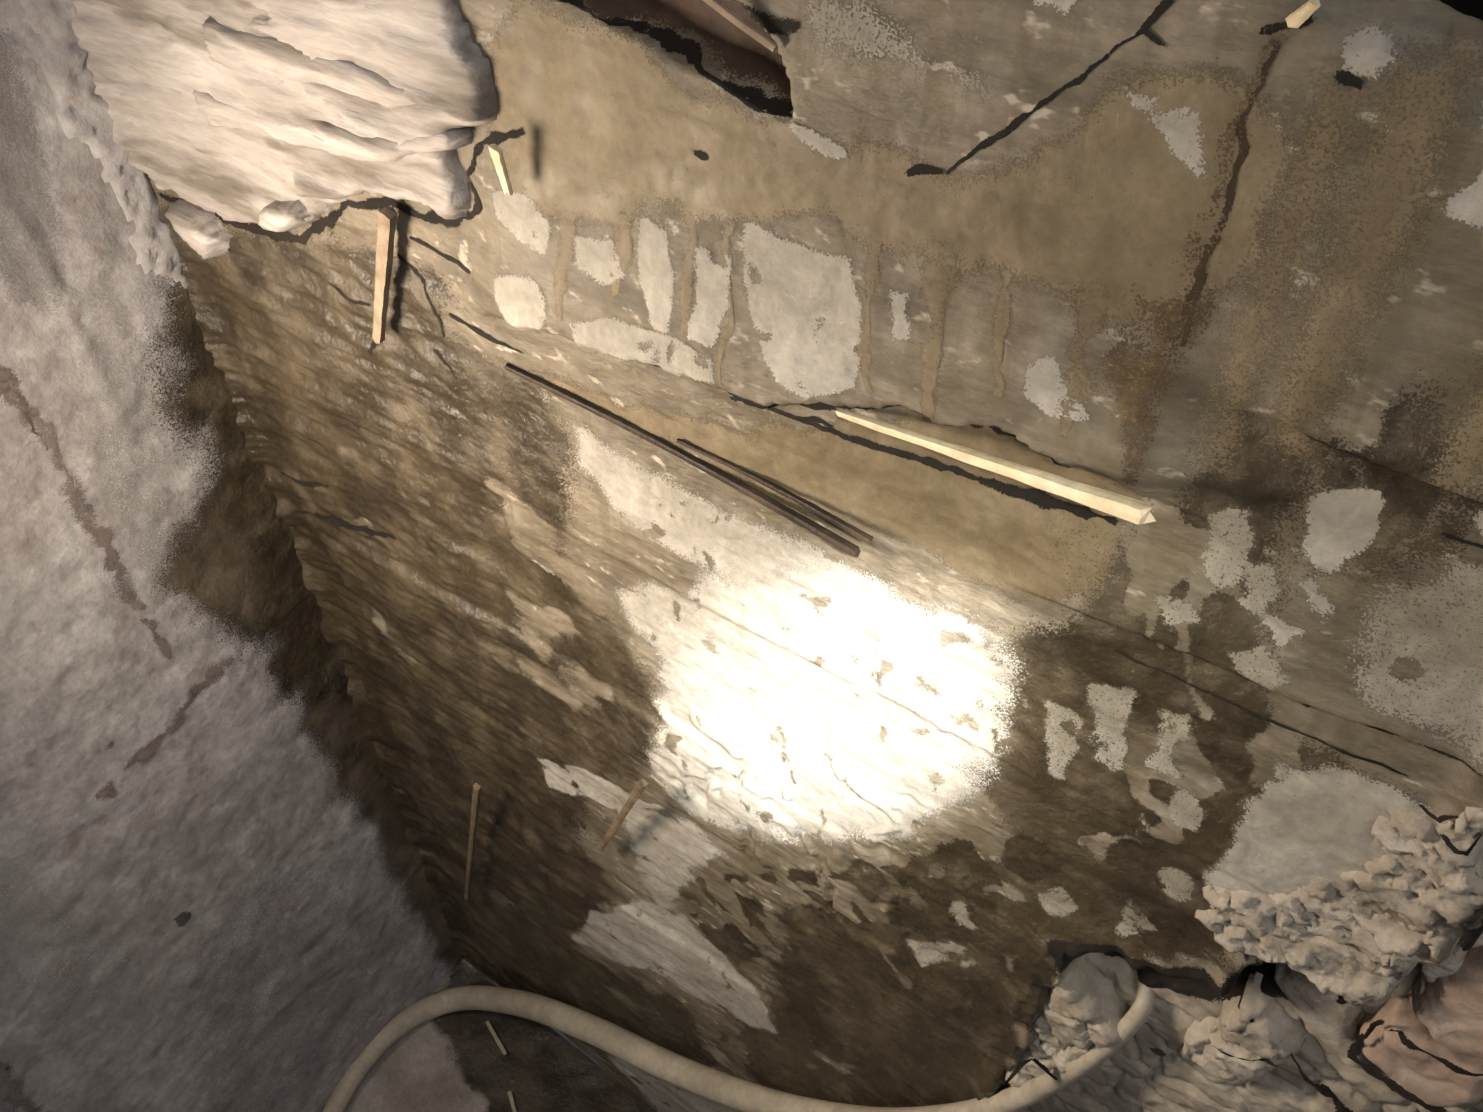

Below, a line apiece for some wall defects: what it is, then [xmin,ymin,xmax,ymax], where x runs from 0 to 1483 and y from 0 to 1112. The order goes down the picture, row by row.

spalling [559,0,996,160]
crack [904,0,1174,177]
rust [1095,26,1290,486]
crack [0,365,173,659]
damp [124,191,720,1067]
crack [728,393,1118,526]
damp [713,34,1483,1107]
crack [1073,609,1483,856]
peeling [1155,756,1483,904]
peeling [1199,485,1483,774]
damp [430,1010,658,1112]
spalling [997,900,1483,1112]